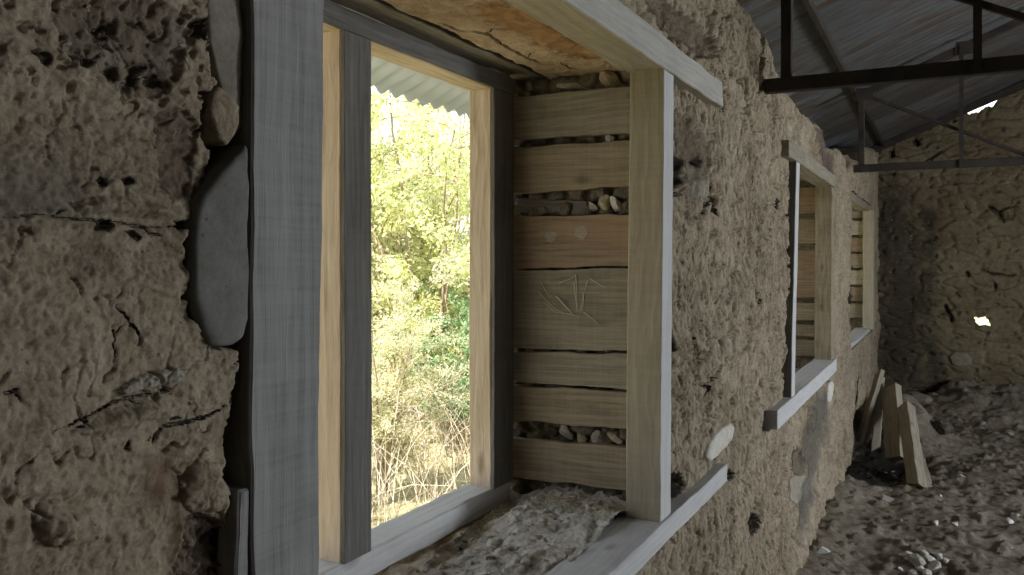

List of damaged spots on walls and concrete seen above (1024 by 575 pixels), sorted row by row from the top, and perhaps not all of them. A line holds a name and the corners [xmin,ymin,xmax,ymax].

crack [2,209,186,236]
crack [111,308,141,360]
crack [54,393,228,452]